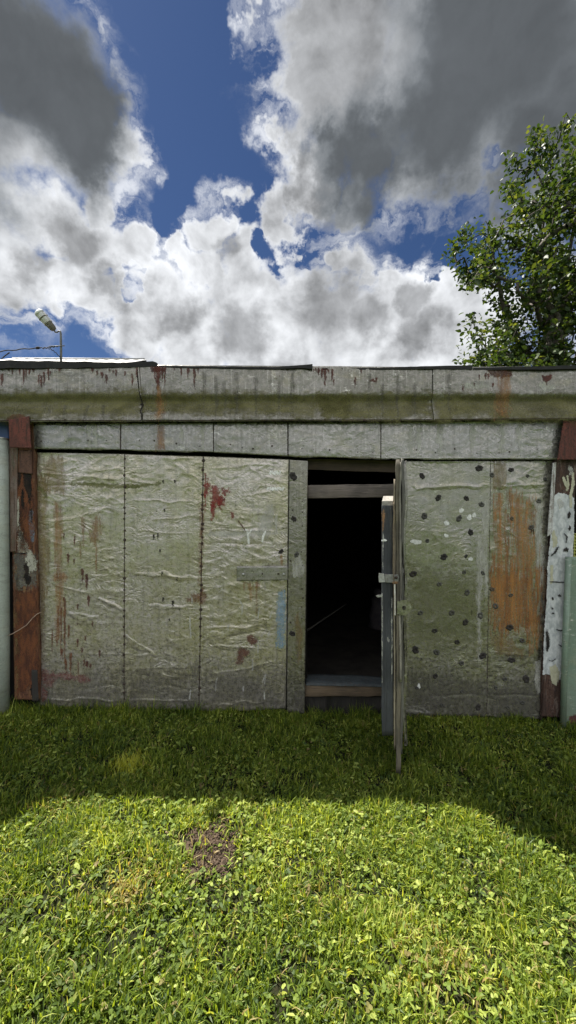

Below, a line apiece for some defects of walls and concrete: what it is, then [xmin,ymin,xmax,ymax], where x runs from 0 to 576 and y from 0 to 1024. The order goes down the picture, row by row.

rust [0,368,61,387]
crack [135,367,143,421]
rust [91,366,199,390]
rust [462,370,512,398]
rust [13,458,101,694]
rust [489,489,546,656]
peeling [535,467,575,693]